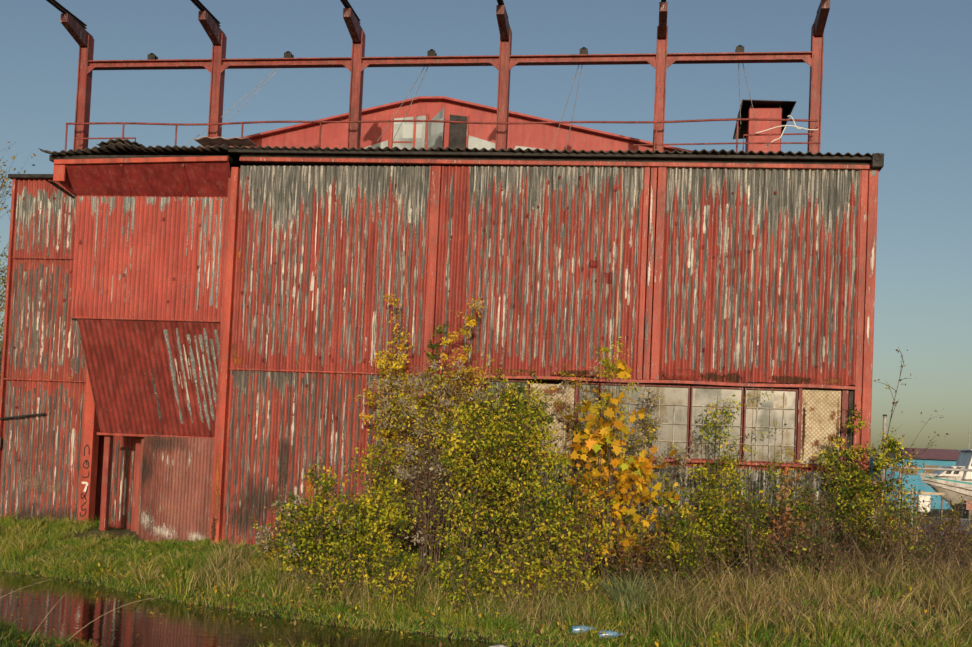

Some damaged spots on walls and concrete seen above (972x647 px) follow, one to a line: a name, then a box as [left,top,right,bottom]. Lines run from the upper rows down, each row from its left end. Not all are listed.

peeling [0,187,227,534]
peeling [225,165,465,552]
peeling [463,166,876,375]